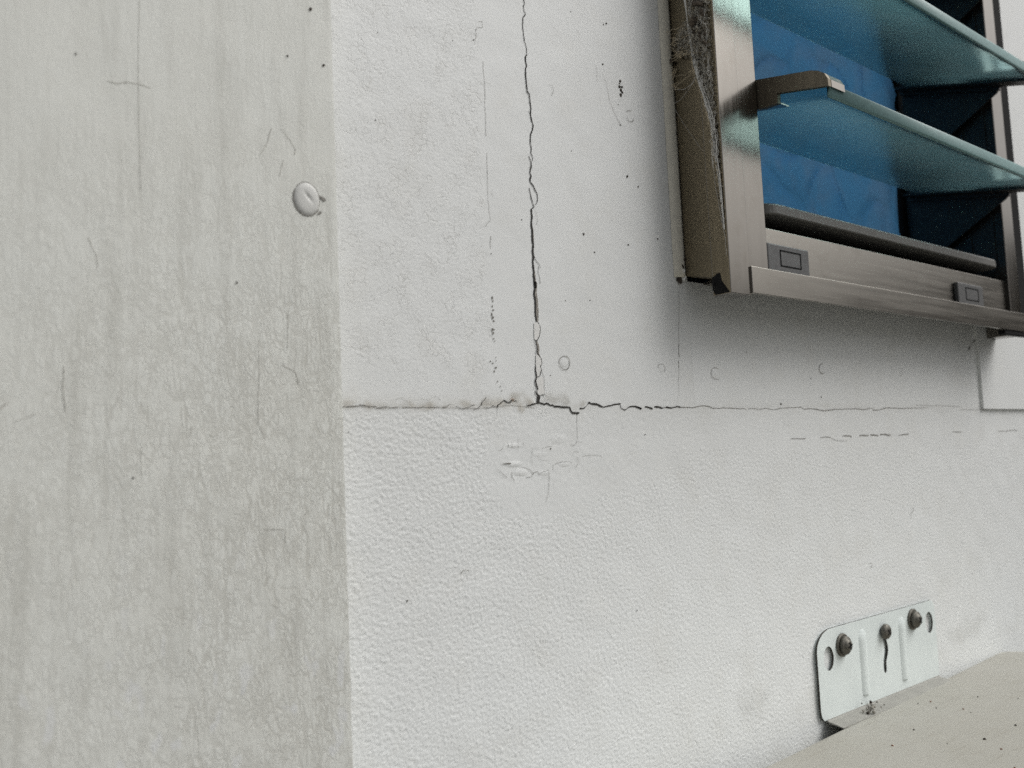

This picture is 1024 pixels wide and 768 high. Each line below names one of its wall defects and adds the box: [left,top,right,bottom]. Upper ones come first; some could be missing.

crack [342,1,967,441]